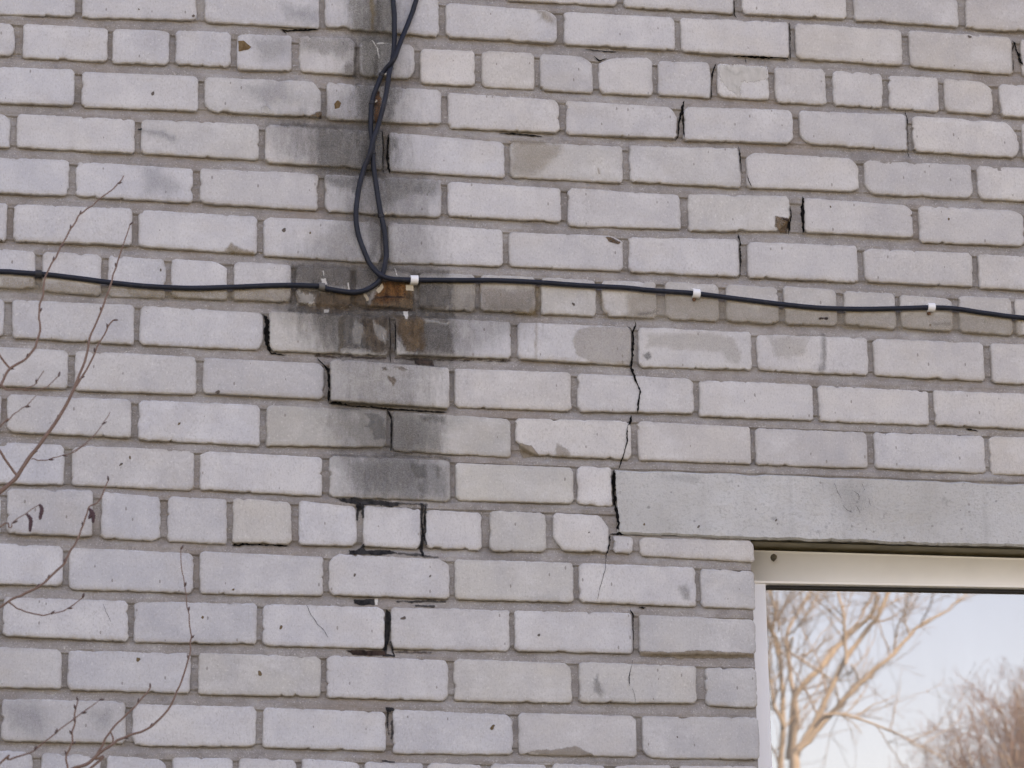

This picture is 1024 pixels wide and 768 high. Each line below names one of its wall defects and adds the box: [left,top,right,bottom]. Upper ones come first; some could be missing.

crack [710,23,791,100]
crack [675,101,685,141]
damp [323,132,383,177]
crack [788,197,805,235]
rust [364,279,414,312]
crack [263,314,285,356]
crack [388,318,396,362]
crack [318,359,445,450]
crack [598,320,641,596]